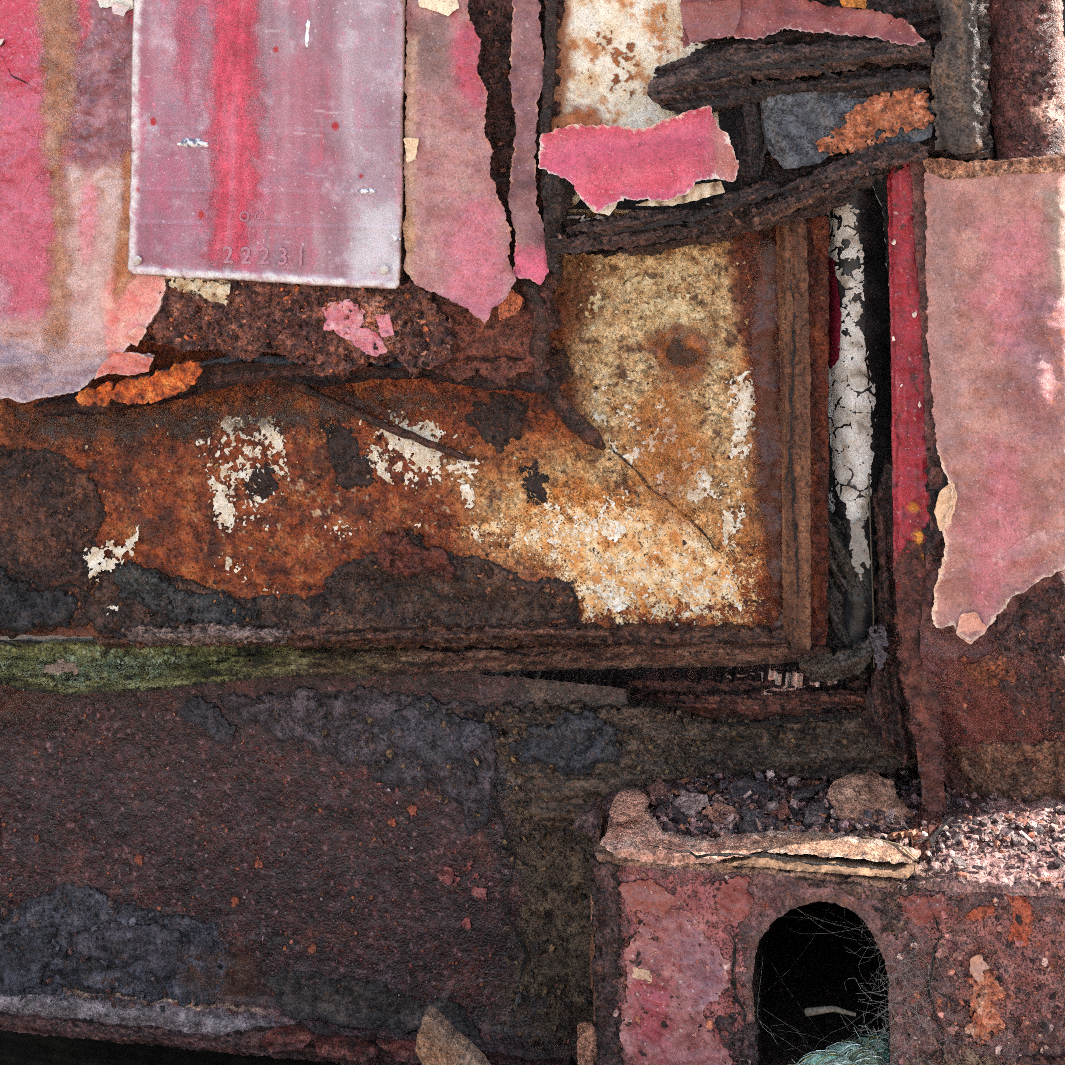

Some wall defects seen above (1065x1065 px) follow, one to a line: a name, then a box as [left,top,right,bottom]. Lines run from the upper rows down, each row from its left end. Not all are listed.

peeling [97,0,134,17]
peeling [392,0,739,337]
rust [815,87,935,155]
peeling [94,325,154,379]
crack [860,214,883,527]
peeling [196,408,291,536]
rust [75,244,790,651]
crack [610,444,721,554]
peeling [912,171,1065,802]